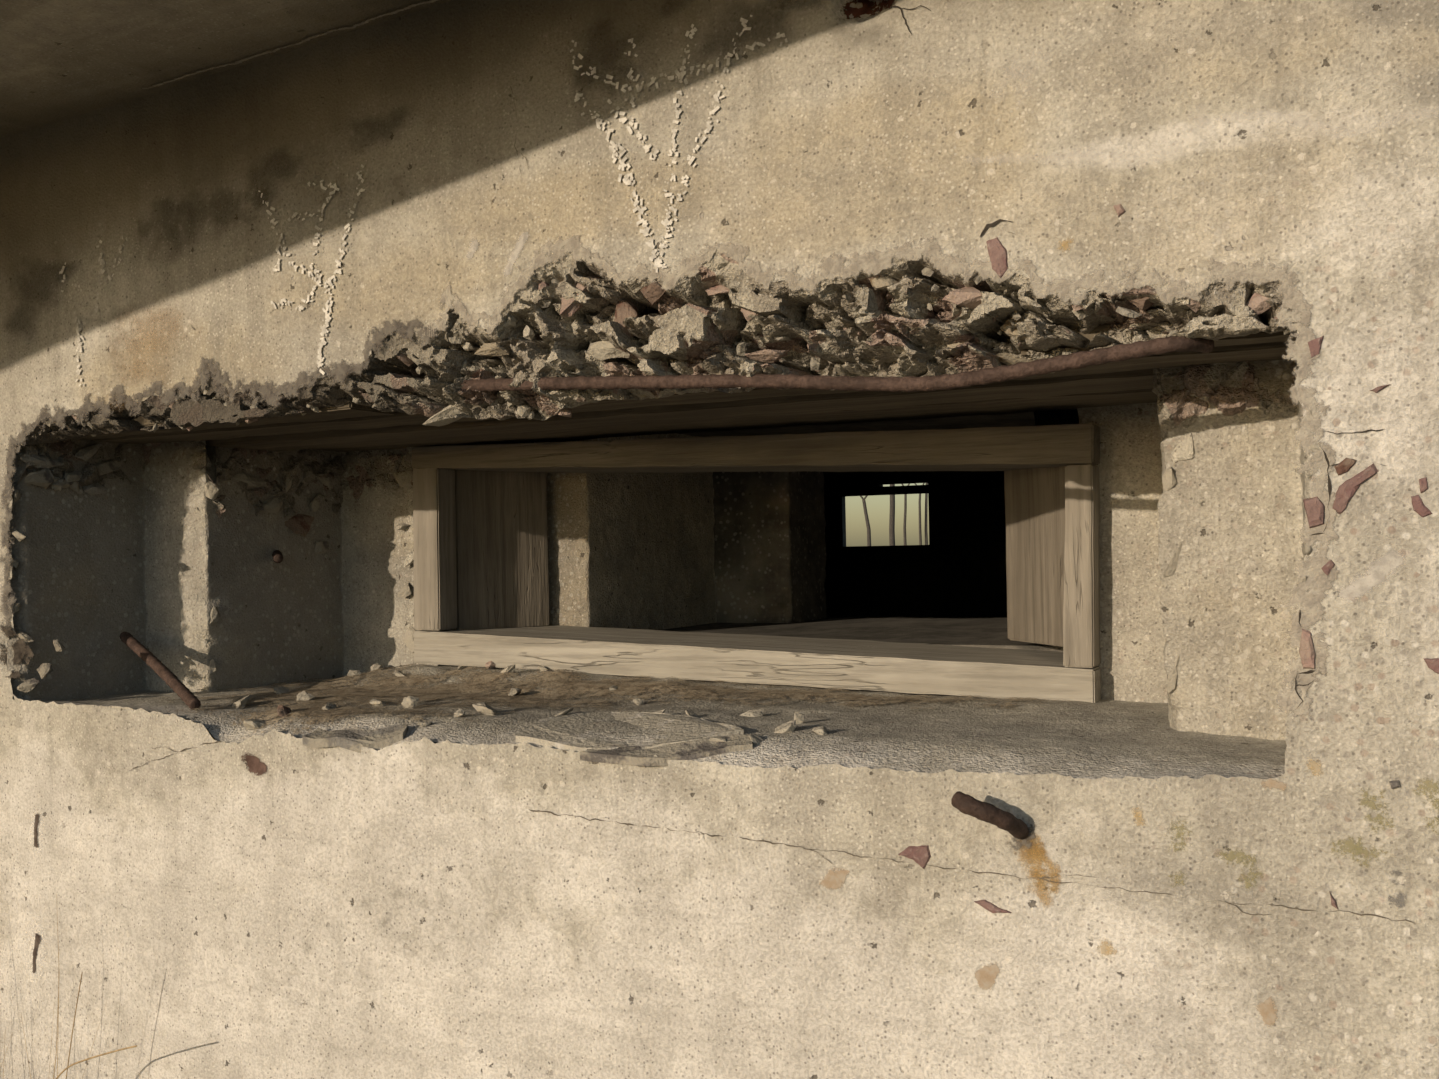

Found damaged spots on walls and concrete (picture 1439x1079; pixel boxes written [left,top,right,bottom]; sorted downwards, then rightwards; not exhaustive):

spalling [0,235,1378,721]
corrosion [120,632,201,710]
crack [529,809,1183,898]
corrosion [1010,827,1058,903]
crack [1222,901,1414,923]